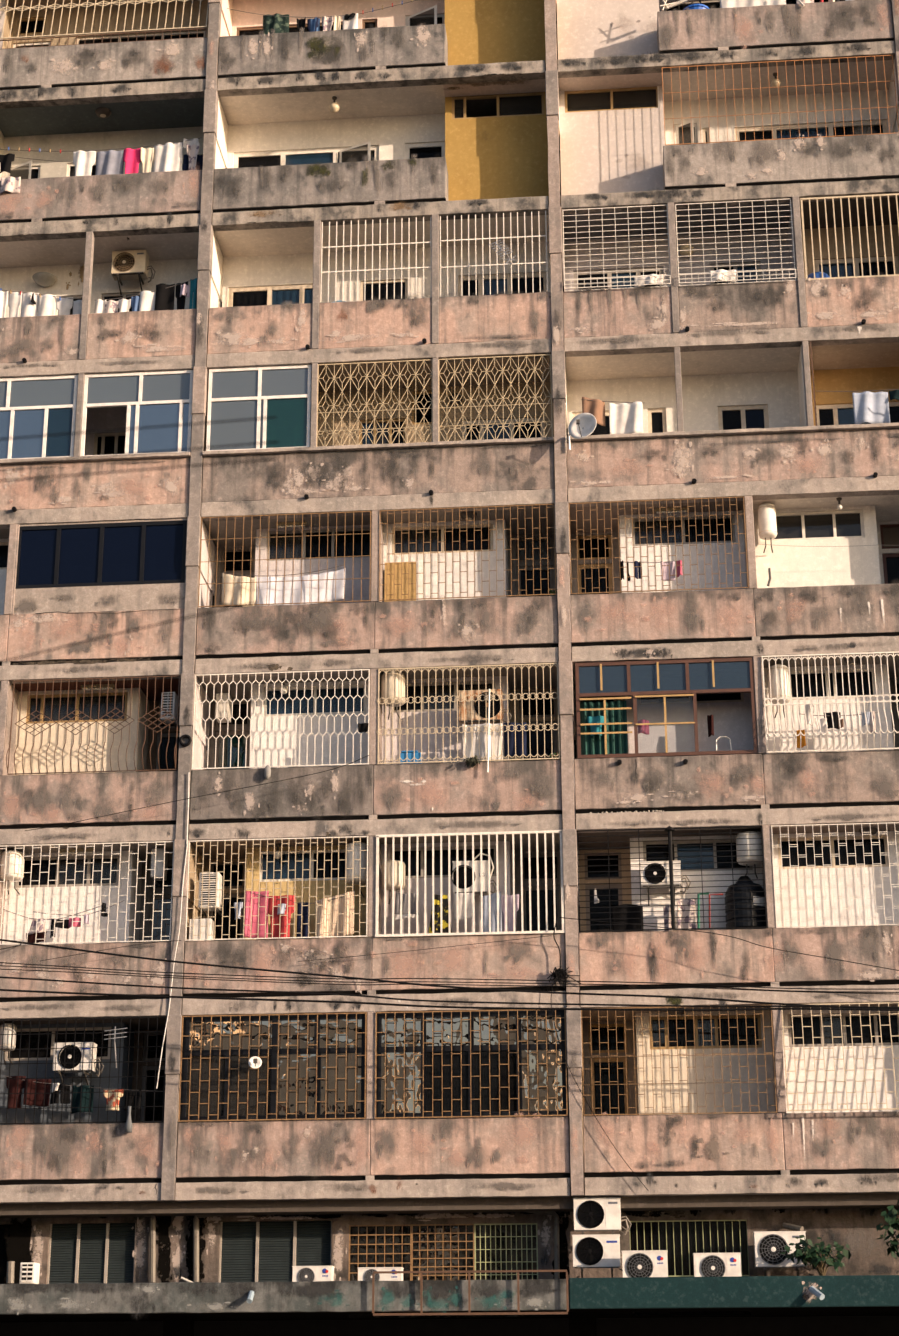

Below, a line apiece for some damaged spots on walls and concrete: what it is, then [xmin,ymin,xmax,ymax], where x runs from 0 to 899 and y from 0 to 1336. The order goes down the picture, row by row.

leakage [281,28,340,81]
leakage [237,607,347,667]
leakage [449,599,494,636]
leakage [795,644,862,652]
leakage [806,586,899,629]
leakage [649,937,689,980]
leakage [283,1131,361,1191]
leakage [377,1131,396,1158]
leakage [467,1139,501,1167]
peeling [237,1214,347,1281]